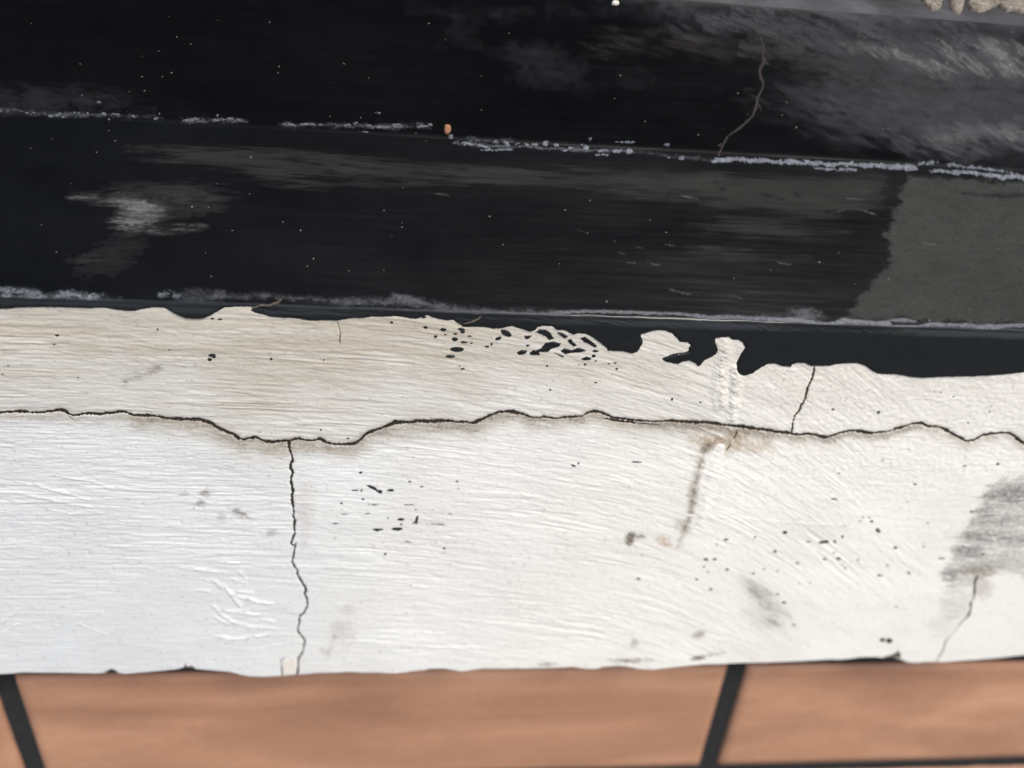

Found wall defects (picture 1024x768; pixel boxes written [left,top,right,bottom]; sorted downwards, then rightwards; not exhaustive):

crack [718,8,769,156]
peeling [0,295,1024,378]
crack [0,366,1024,675]